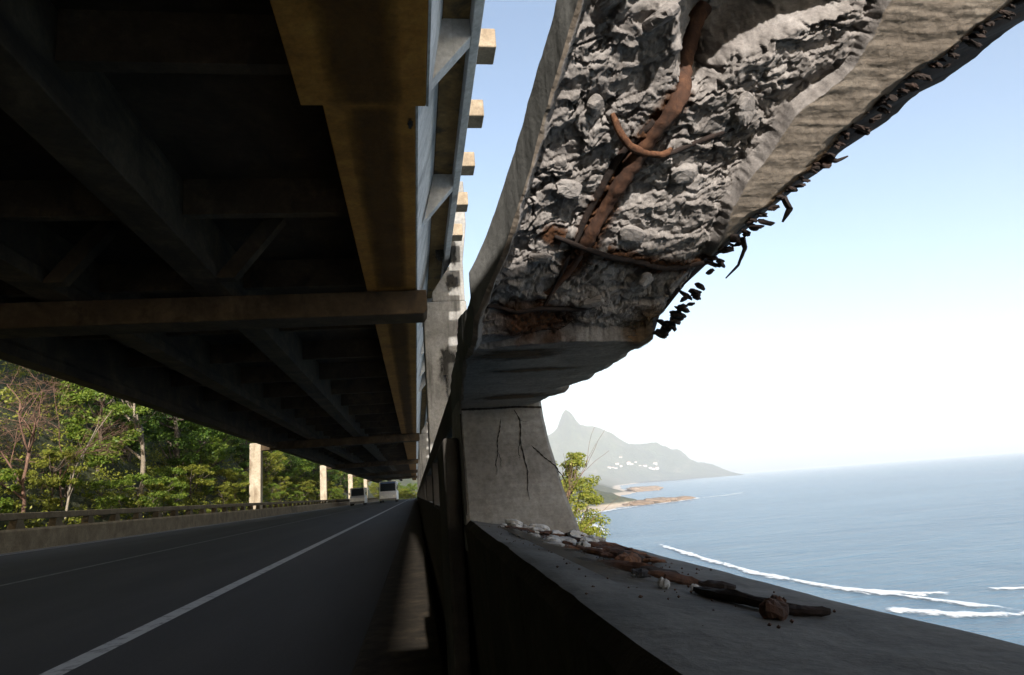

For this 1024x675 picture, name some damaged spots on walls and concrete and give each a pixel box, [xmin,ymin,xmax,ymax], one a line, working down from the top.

rust [540,84,710,277]
spalling [474,0,1024,350]
rust [496,300,577,346]
crack [461,406,569,500]